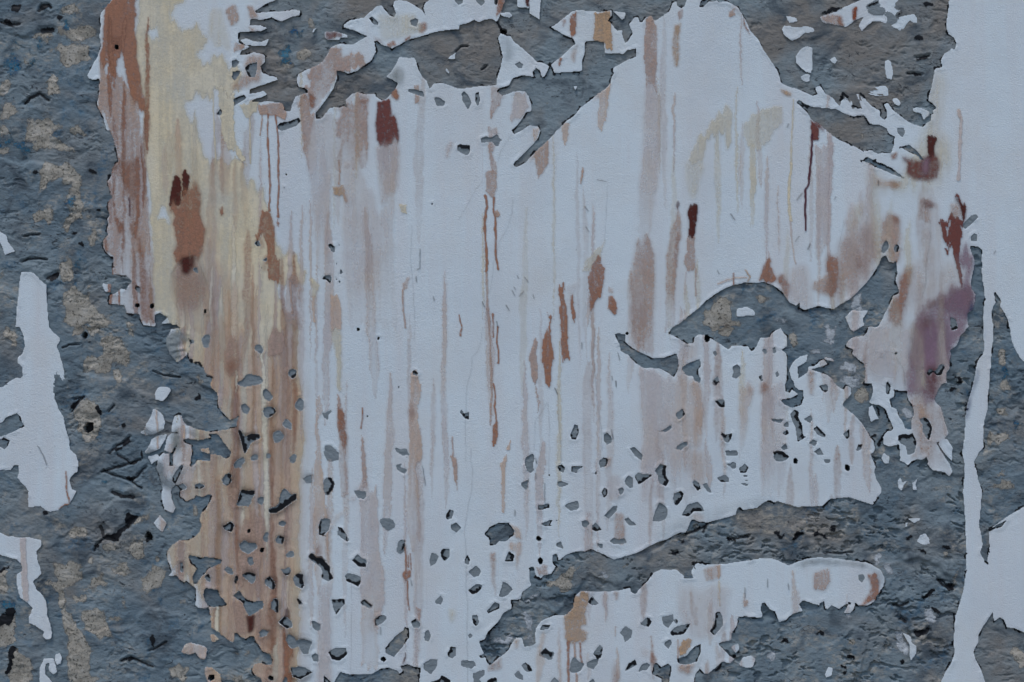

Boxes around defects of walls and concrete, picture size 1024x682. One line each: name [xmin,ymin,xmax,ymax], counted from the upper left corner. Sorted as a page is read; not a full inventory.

corrosion [100,0,150,250]
flaking render [0,0,349,682]
corrosion [169,169,205,309]
corrosion [255,103,299,323]
corrosion [338,89,399,186]
flaking render [232,0,686,167]
corrosion [483,142,500,447]
corrosion [529,256,617,413]
flaking render [699,0,956,179]
corrosion [892,135,939,180]
corrosion [924,193,966,287]
flaking render [324,214,1024,682]